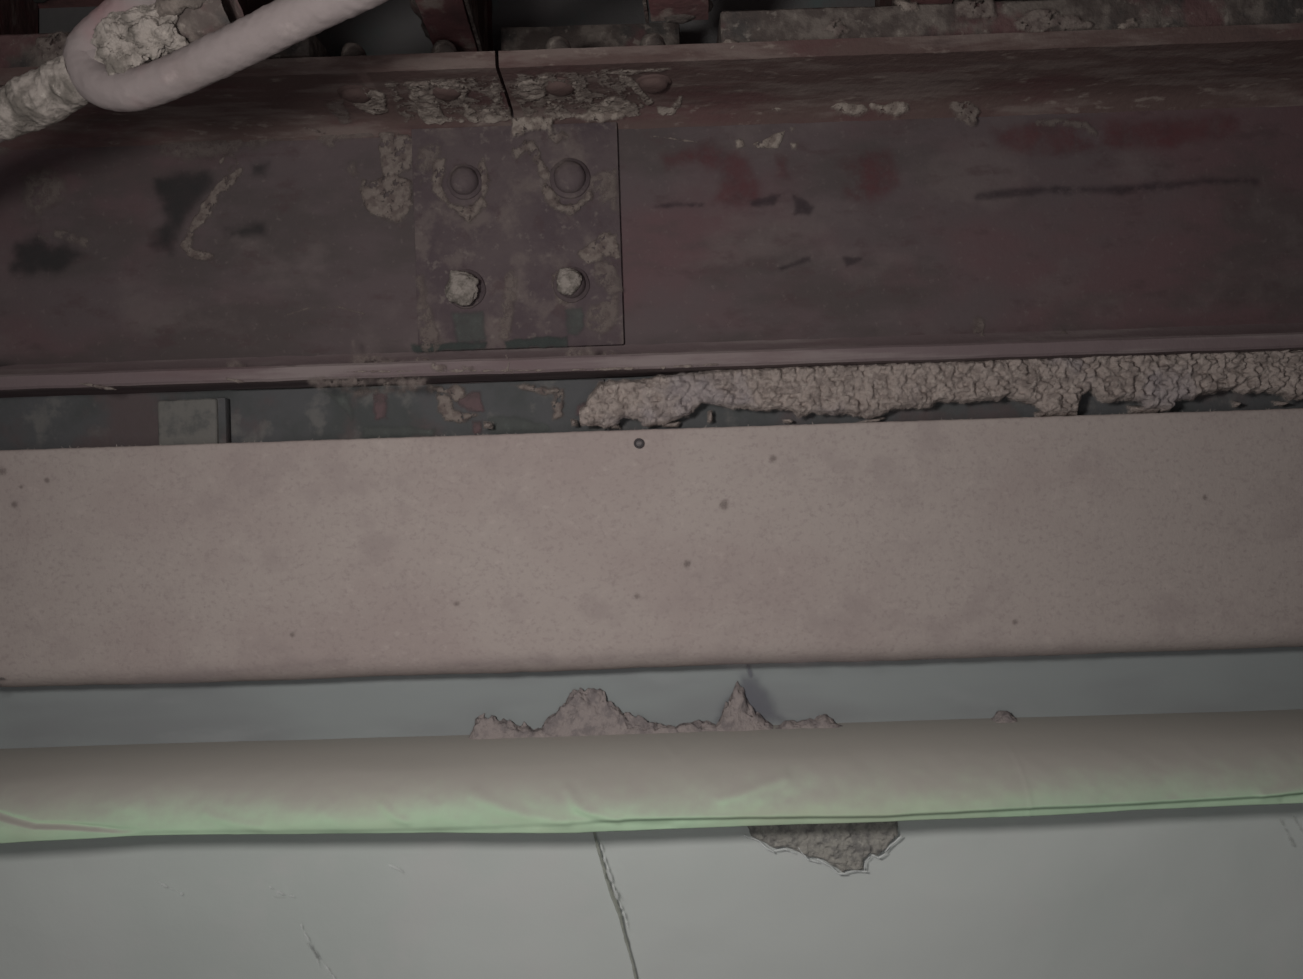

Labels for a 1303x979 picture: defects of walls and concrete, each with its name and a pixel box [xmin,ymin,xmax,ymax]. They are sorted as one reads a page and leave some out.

peeling [353,89,388,115]
peeling [319,132,490,223]
peeling [406,68,682,215]
peeling [577,232,622,332]
spalling [310,350,1303,438]
spalling [743,821,902,875]
crack [593,832,637,979]